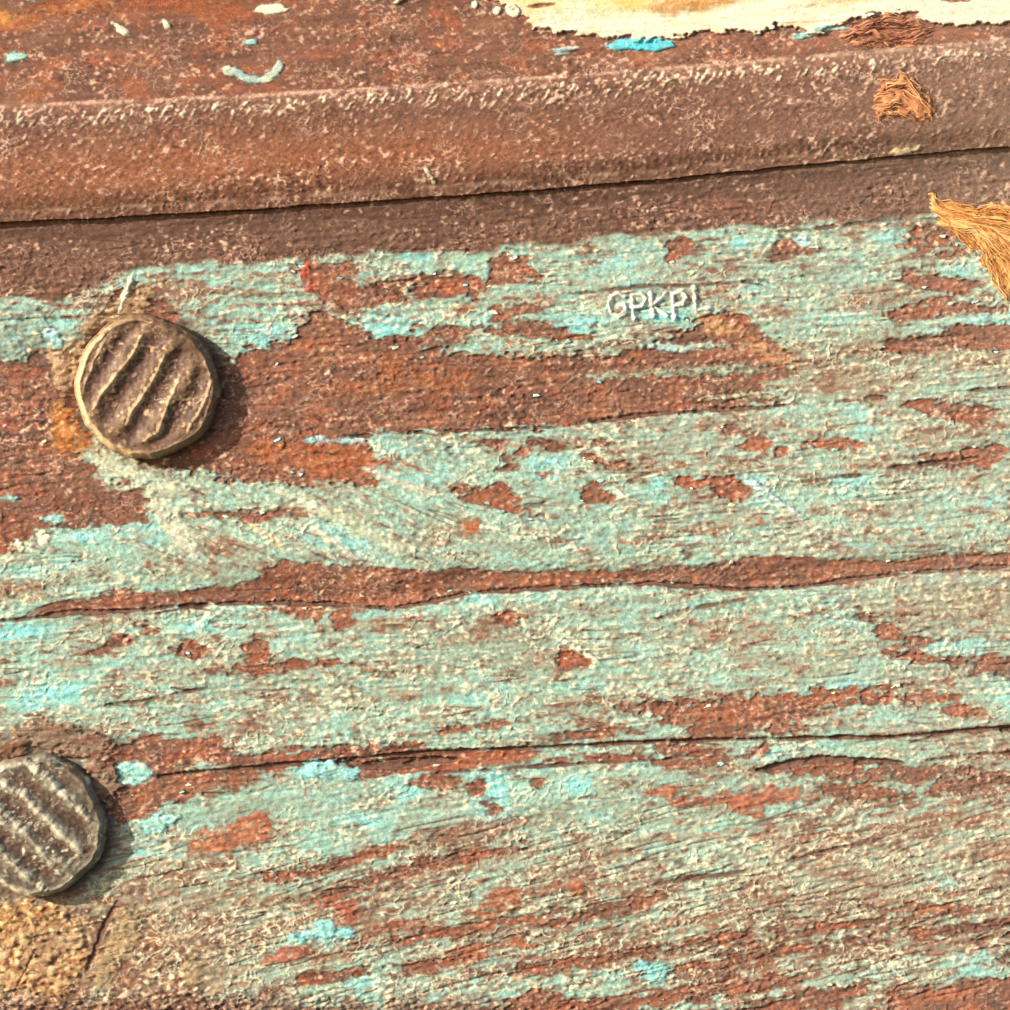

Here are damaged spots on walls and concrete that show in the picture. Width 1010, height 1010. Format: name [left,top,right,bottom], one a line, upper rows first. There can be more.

peeling [0,0,1010,105]
peeling [879,268,1010,357]
peeling [0,305,156,555]
peeling [140,252,807,520]
crack [2,564,1010,622]
peeling [27,552,1010,631]
peeling [168,634,366,678]
peeling [857,606,1010,677]
peeling [0,683,1010,836]
crack [158,725,1010,778]
peeling [262,827,530,903]
peeling [504,901,1010,1010]